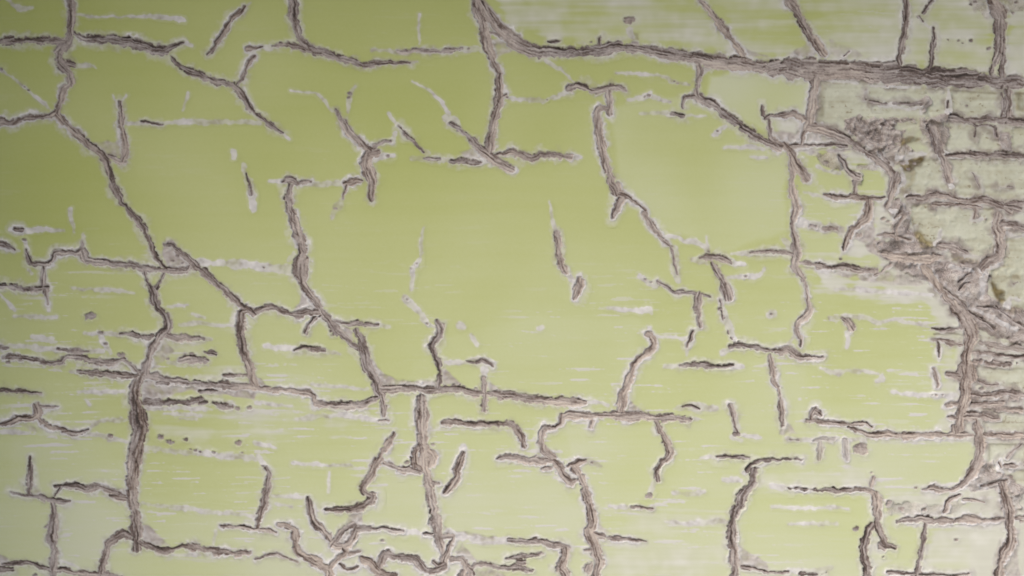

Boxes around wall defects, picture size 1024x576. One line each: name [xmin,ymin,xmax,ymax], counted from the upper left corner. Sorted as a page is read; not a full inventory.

spalling [612,69,1024,338]
crack [0,0,702,576]
crack [479,0,1024,576]
spalling [839,309,862,352]
peeling [887,386,959,402]
spalling [851,437,873,462]
spalling [885,441,1024,517]